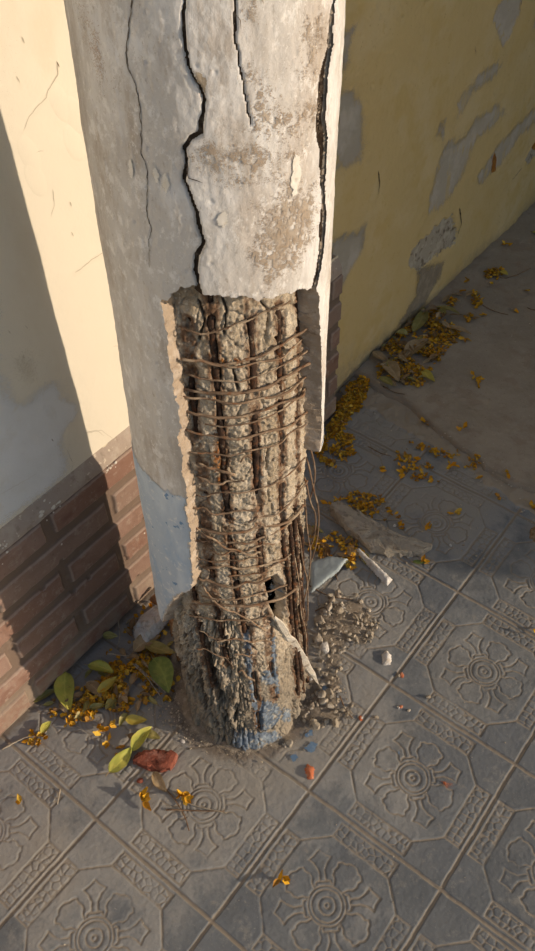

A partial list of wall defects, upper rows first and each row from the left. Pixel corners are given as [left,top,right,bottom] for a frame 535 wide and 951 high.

crack [125,0,152,261]
crack [182,0,206,294]
crack [220,0,251,125]
crack [312,0,336,287]
peeling [408,59,509,271]
spalling [161,280,348,752]